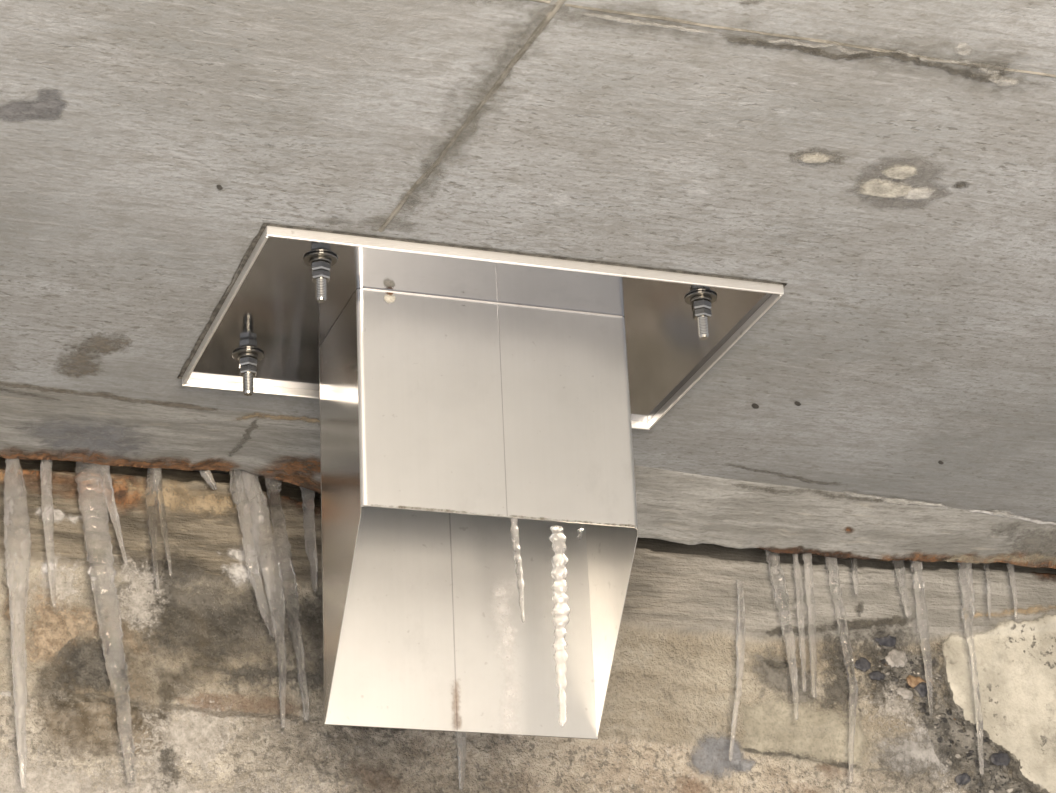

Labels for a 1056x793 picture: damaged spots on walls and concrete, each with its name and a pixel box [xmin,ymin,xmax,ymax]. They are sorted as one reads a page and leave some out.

spalling [791,149,847,165]
spalling [852,158,949,208]
corrosion [0,450,237,514]
corrosion [258,457,321,516]
corrosion [762,546,870,560]
corrosion [883,553,1056,581]
leakage [0,550,323,793]
spalling [752,624,1049,793]